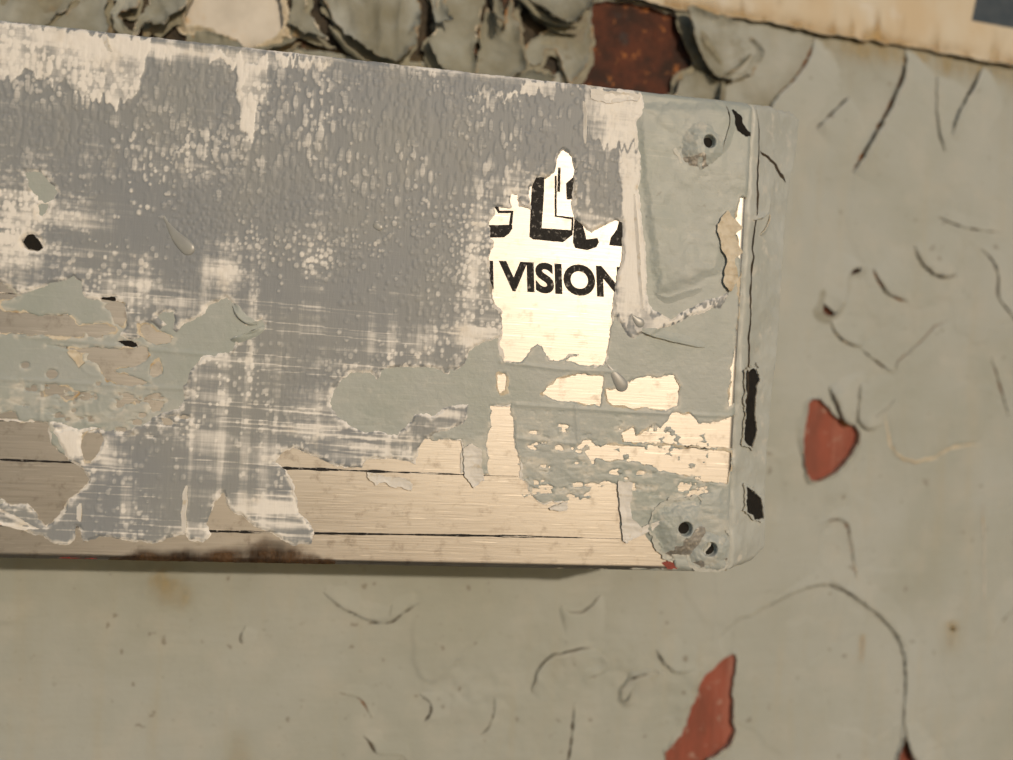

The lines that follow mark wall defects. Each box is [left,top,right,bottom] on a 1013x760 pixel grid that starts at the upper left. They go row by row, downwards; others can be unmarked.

peeling [0,0,765,99]
crack [852,49,1004,189]
crack [722,37,842,404]
crack [981,245,1013,317]
peeling [0,149,746,570]
crack [859,341,896,374]
peeling [796,394,862,486]
crack [363,729,411,760]
crack [420,691,453,723]
crack [568,703,594,760]
peeling [663,649,742,760]
peeling [896,728,915,760]